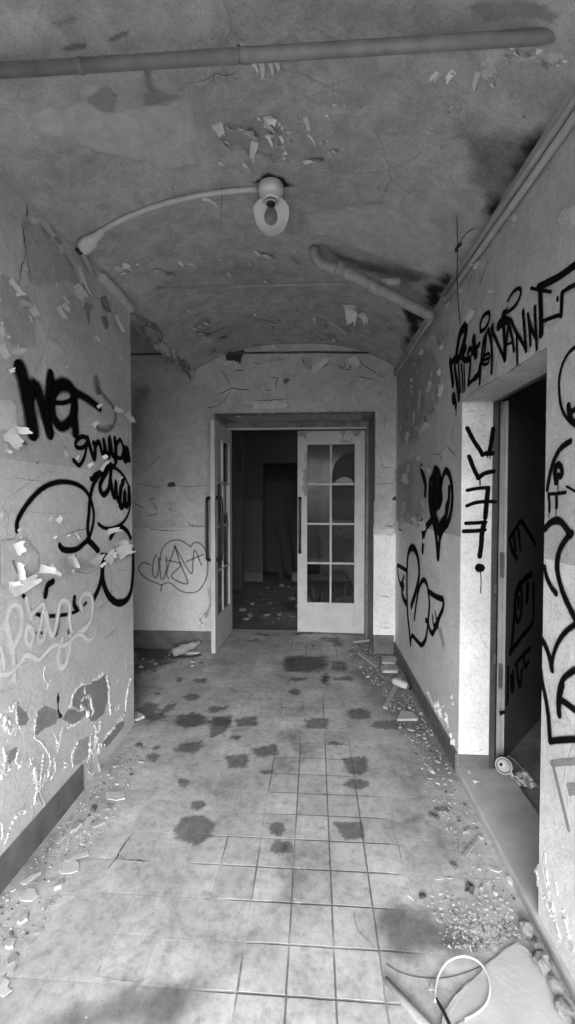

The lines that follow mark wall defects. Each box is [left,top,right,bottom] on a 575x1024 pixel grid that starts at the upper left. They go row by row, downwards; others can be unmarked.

peeling [212,93,348,174]
peeling [0,267,40,374]
spalling [26,214,194,380]
crack [208,296,395,430]
peeling [294,305,369,373]
spalling [0,659,132,844]
leakage [140,678,256,740]
leakage [226,744,277,767]
leakage [307,719,327,729]
leakage [175,802,214,843]
leakage [270,824,293,853]
spalling [534,852,574,952]